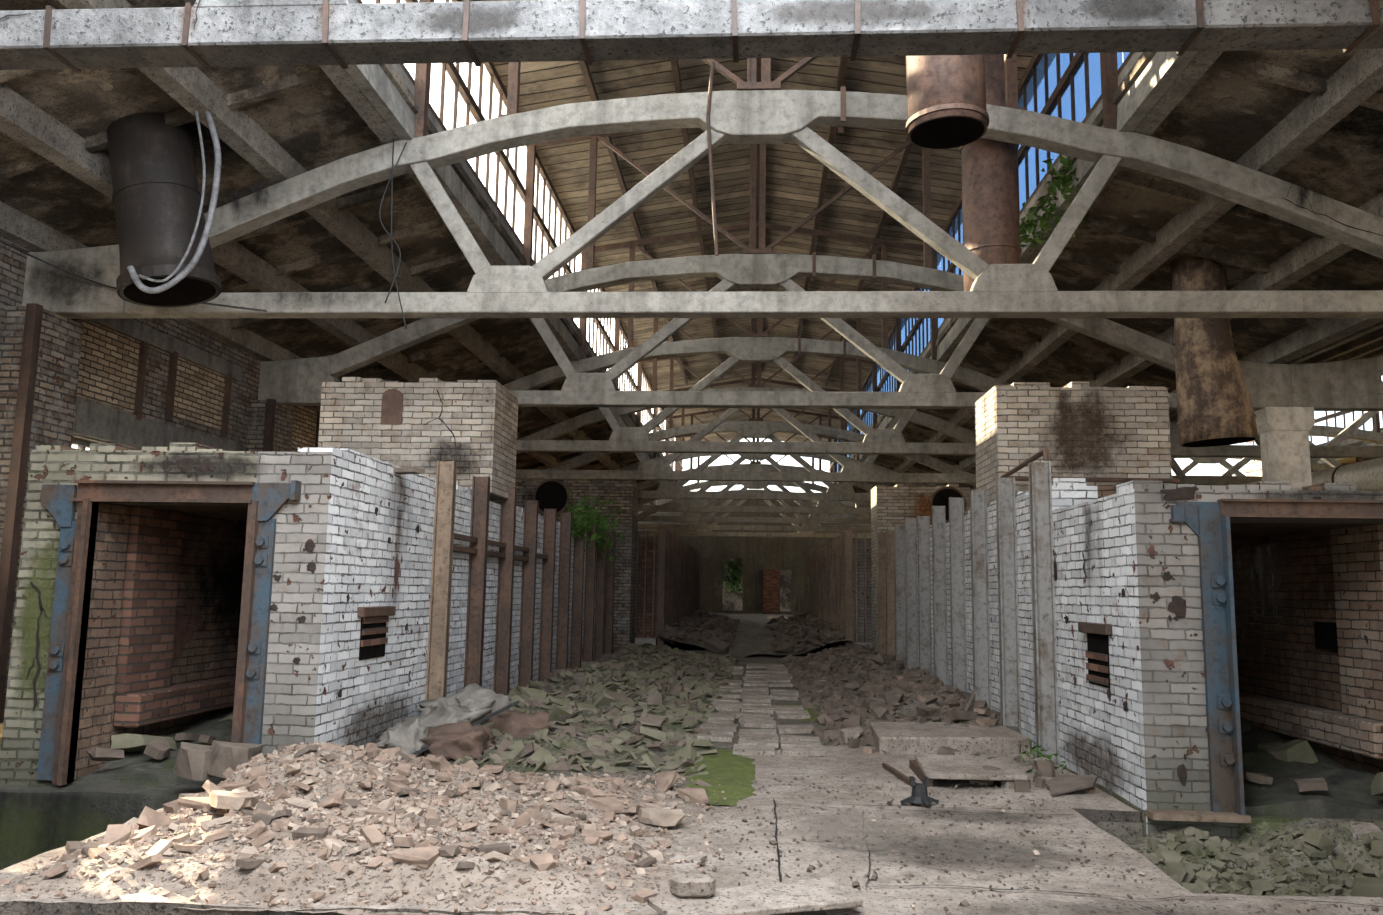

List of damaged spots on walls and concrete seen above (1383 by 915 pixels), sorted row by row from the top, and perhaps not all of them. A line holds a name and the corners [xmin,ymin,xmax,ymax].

spalling [303,540,316,573]
spalling [1150,571,1186,622]